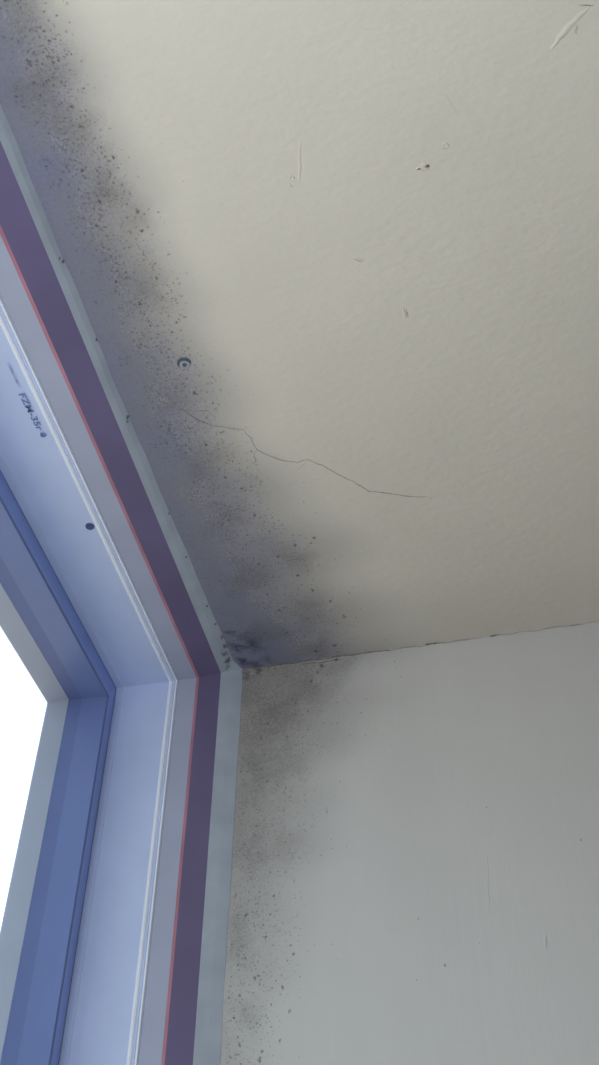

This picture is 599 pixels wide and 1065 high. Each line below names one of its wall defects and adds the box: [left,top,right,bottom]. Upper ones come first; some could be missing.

leakage [0,0,339,739]